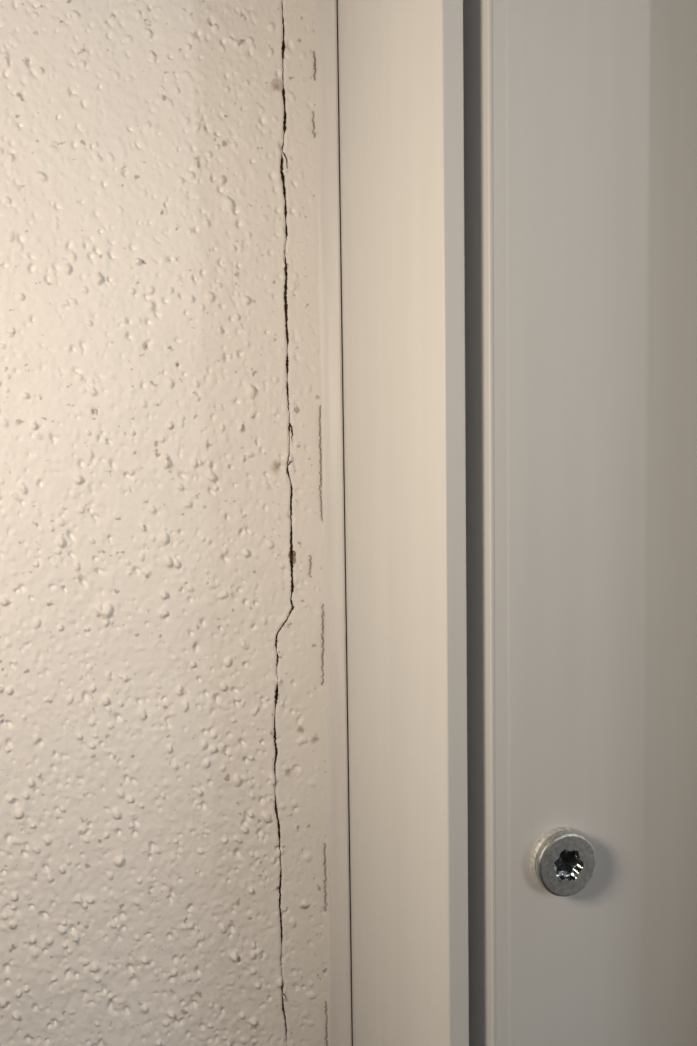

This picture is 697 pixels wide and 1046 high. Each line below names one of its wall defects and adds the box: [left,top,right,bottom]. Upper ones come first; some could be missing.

crack [316,407,324,520]
crack [273,4,311,1039]
crack [318,605,326,684]